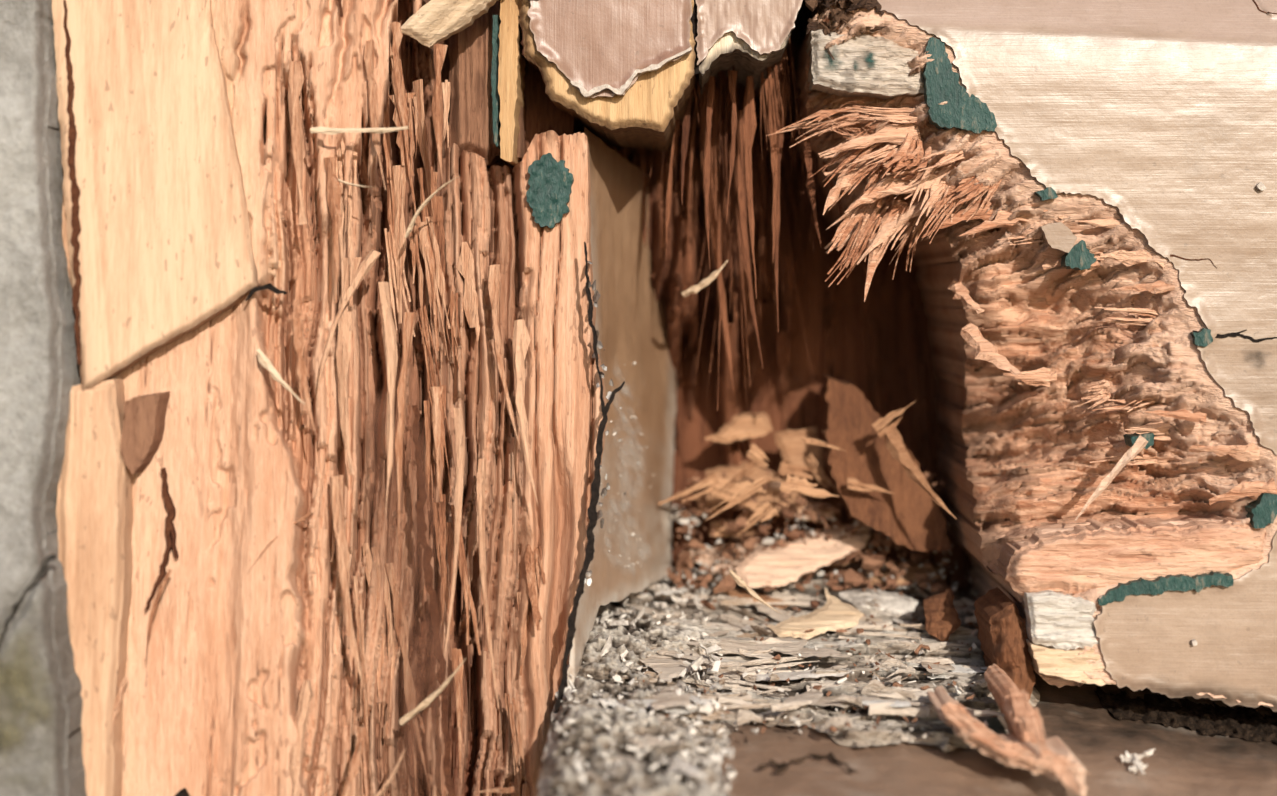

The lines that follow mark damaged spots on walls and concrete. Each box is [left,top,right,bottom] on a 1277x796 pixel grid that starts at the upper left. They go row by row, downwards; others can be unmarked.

peeling [1039,222,1077,253]
crack [1192,329,1277,342]
crack [144,467,179,611]
crack [0,554,57,649]